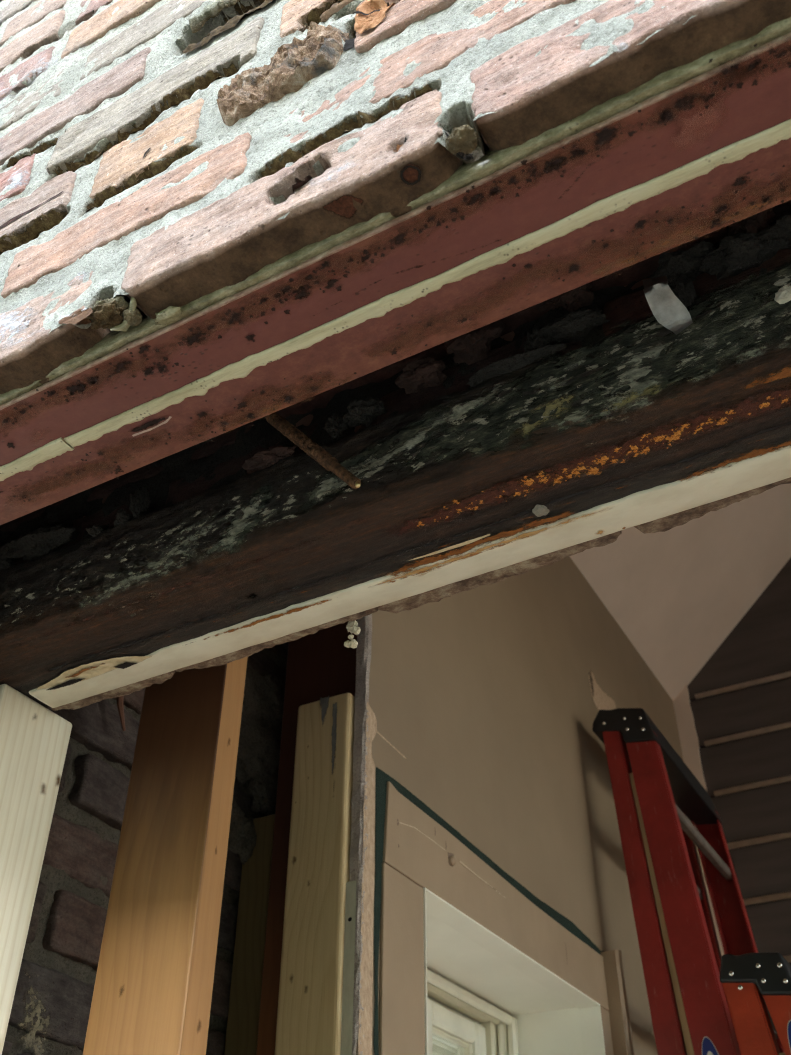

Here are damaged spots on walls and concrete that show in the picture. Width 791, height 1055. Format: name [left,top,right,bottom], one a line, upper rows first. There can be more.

spalling [216,0,396,126]
spalling [58,296,142,330]
rust [0,37,791,428]
peeling [132,416,172,437]
damp [0,261,791,625]
rust [386,367,791,536]
spalling [634,477,791,534]
spalling [37,531,622,1055]